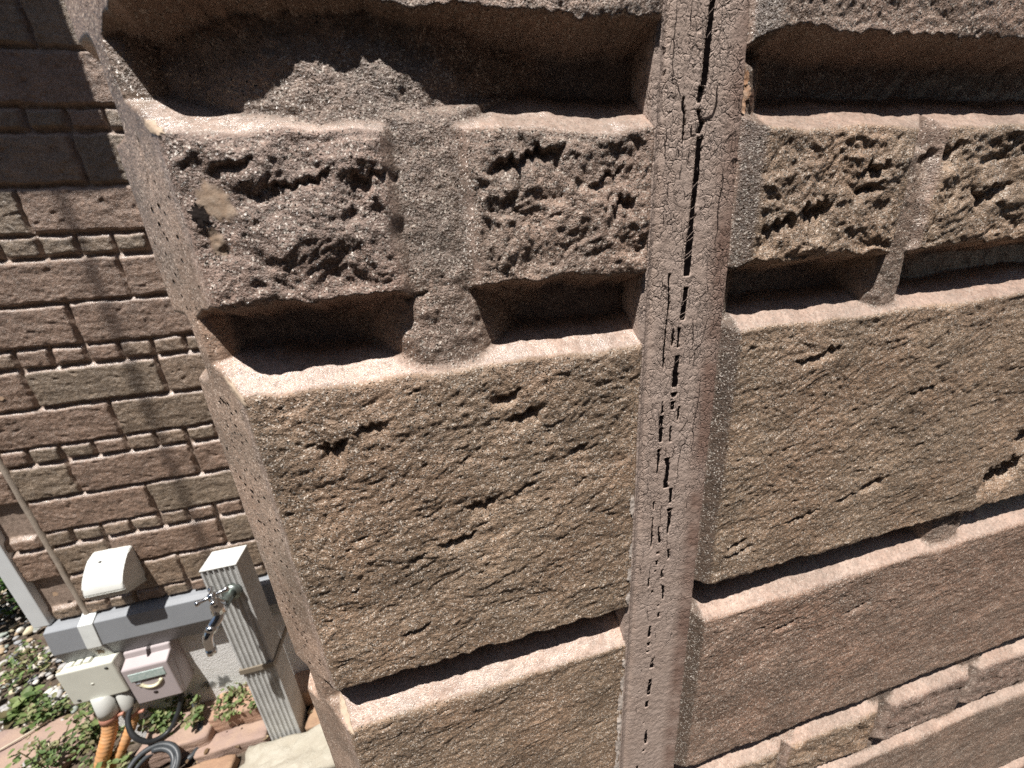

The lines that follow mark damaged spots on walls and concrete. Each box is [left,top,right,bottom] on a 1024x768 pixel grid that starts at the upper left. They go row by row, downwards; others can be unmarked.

crack [636,0,740,768]